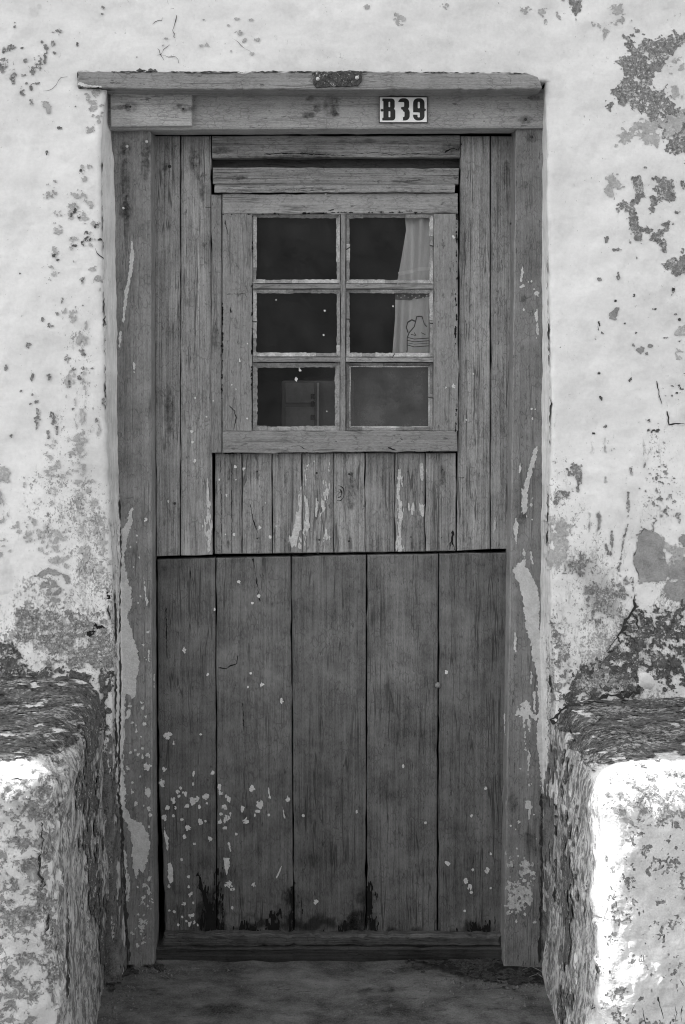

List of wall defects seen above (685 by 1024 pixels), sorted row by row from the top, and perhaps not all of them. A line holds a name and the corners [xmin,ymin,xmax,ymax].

peeling [591,4,685,156]
peeling [604,166,685,296]
peeling [13,567,70,644]
peeling [66,609,116,673]
crack [607,529,656,653]
flaking render [633,450,685,602]